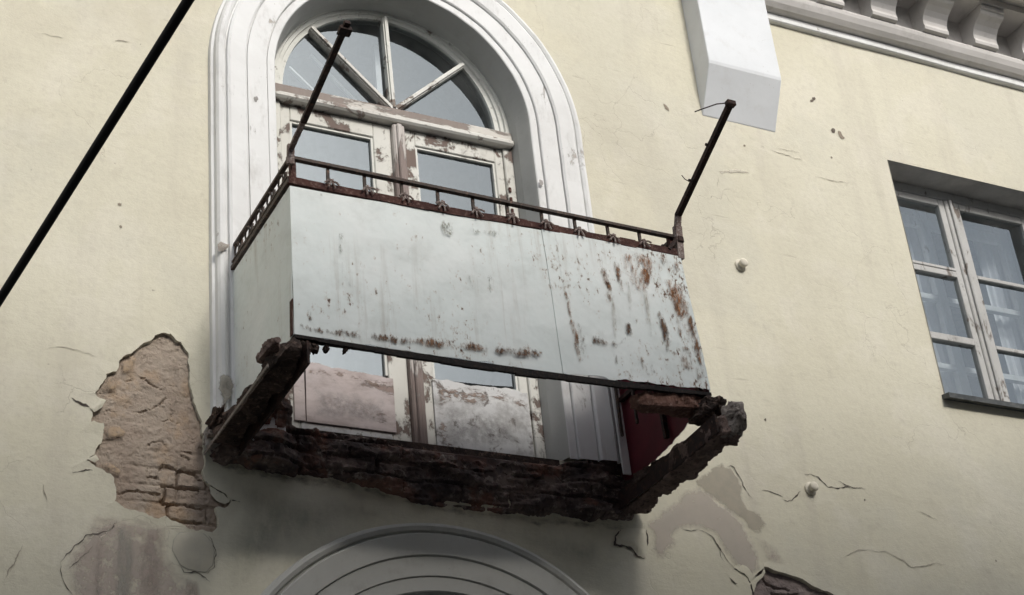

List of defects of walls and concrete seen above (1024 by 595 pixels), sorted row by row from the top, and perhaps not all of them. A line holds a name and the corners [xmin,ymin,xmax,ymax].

corrosion [602,254,678,306]
corrosion [374,334,445,347]
corrosion [466,342,542,356]
corrosion [564,292,617,362]
corrosion [659,280,703,377]
spalling [219,375,234,409]
peeling [439,386,524,406]
spalling [88,334,229,532]
peeling [697,466,764,530]
crack [730,465,860,501]
crack [846,549,946,568]
spalling [751,569,828,595]